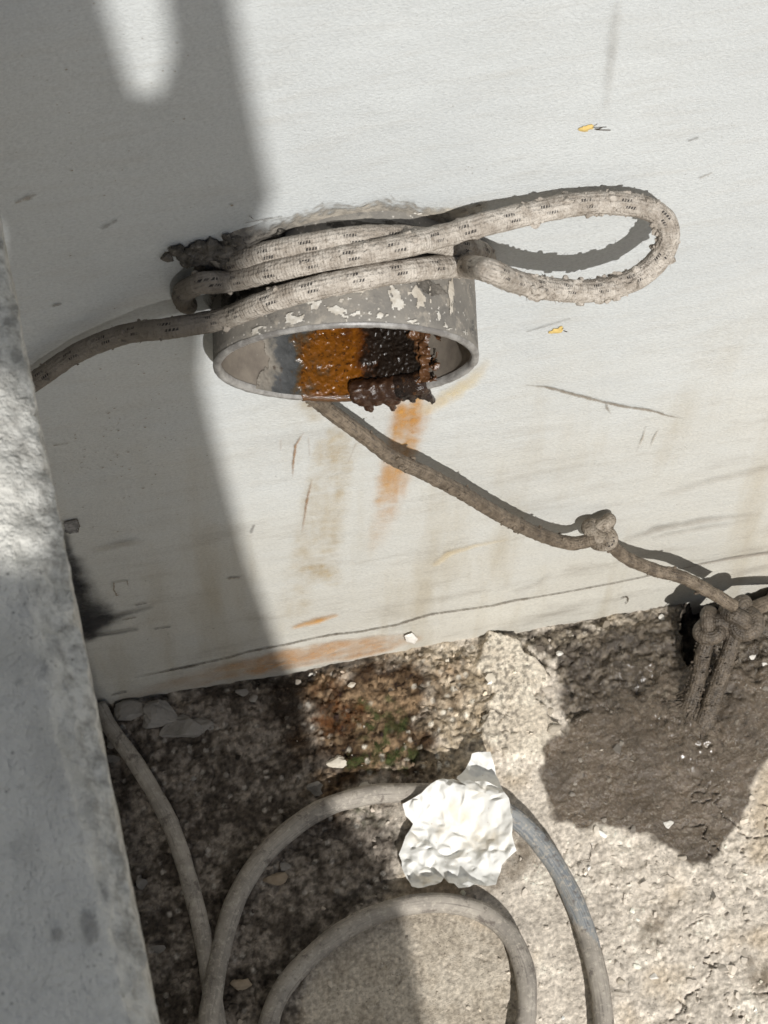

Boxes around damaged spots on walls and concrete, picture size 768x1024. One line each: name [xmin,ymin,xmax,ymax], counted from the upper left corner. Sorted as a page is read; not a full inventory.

peeling [285,278,468,335]
corrosion [290,328,378,396]